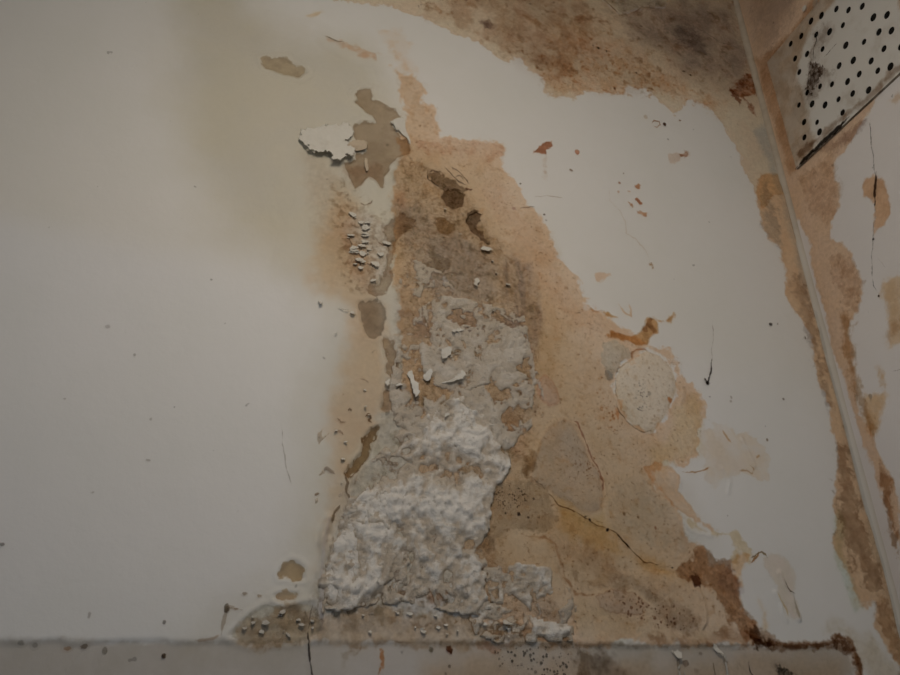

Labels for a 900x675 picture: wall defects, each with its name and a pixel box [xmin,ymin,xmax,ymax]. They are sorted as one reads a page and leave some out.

peeling [299,122,369,171]
peeling [347,212,391,269]
peeling [385,369,433,397]
water stain [317,259,577,675]
crack [555,501,650,563]
crack [306,634,314,675]
water stain [750,625,771,649]